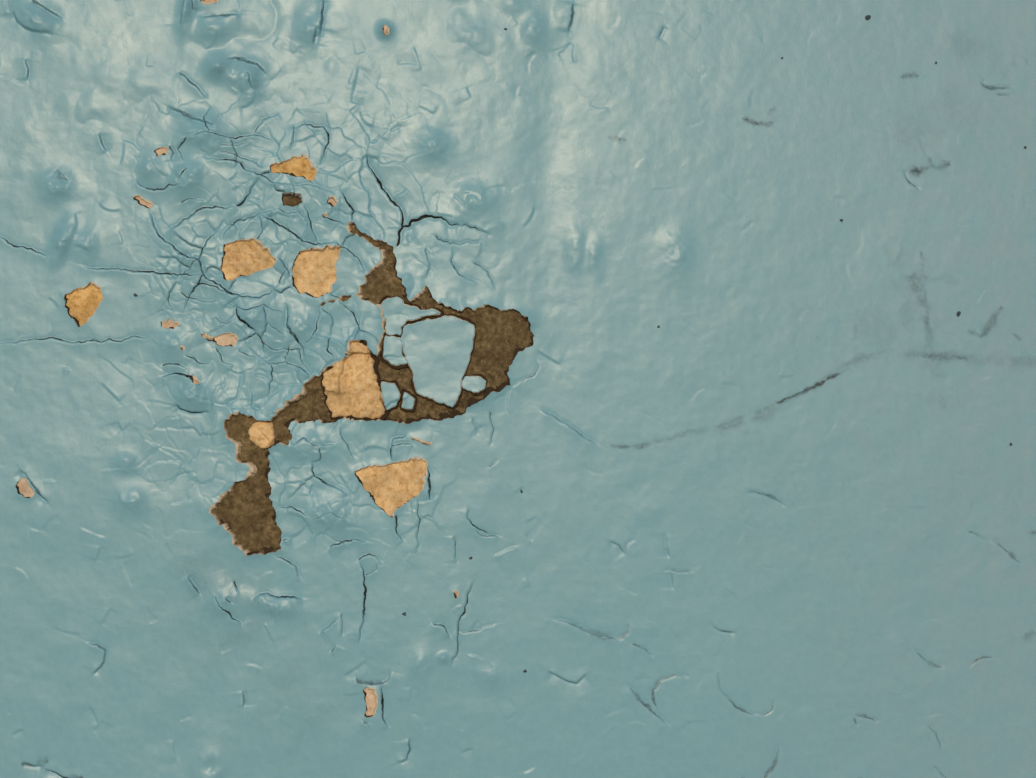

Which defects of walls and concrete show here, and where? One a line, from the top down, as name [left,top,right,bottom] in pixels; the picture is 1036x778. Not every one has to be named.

peeling [270,154,317,181]
crack [367,160,493,283]
crack [130,113,366,391]
peeling [64,282,103,327]
peeling [201,332,238,347]
spalling [209,222,534,556]
peeling [15,478,34,498]
crack [395,471,431,536]
peeling [363,687,379,717]